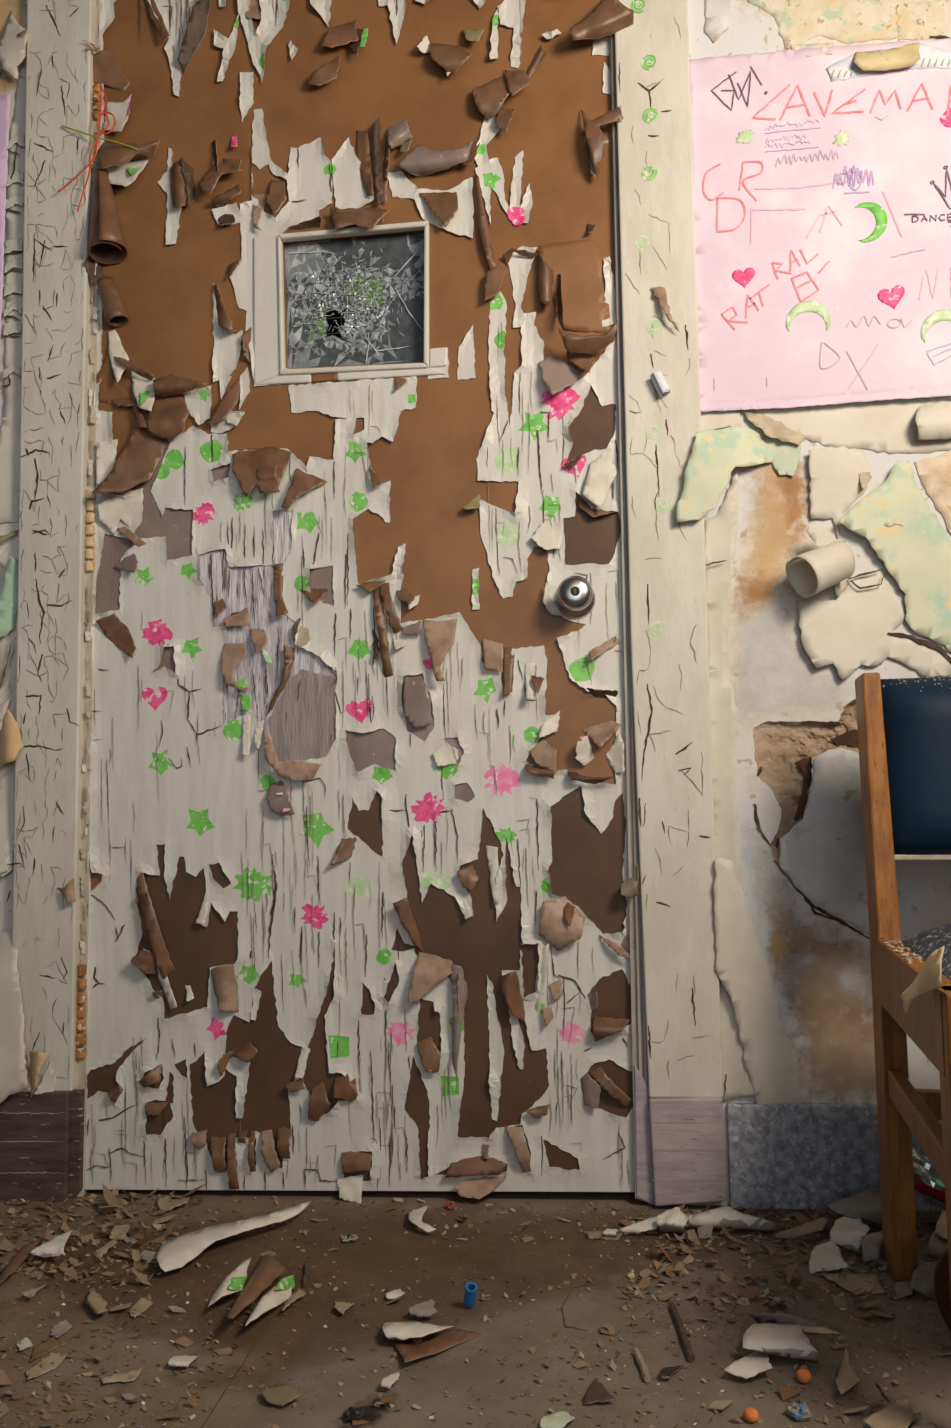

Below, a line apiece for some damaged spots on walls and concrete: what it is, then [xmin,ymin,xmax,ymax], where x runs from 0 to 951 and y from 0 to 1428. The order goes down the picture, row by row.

peeling [704,0,947,71]
peeling [0,10,29,877]
peeling [57,738,103,978]
crack [2,0,458,1191]
peeling [84,0,646,1203]
crack [443,642,538,792]
crack [487,62,727,911]
crack [511,798,710,1188]
crack [754,766,870,939]
peeling [676,396,951,1105]